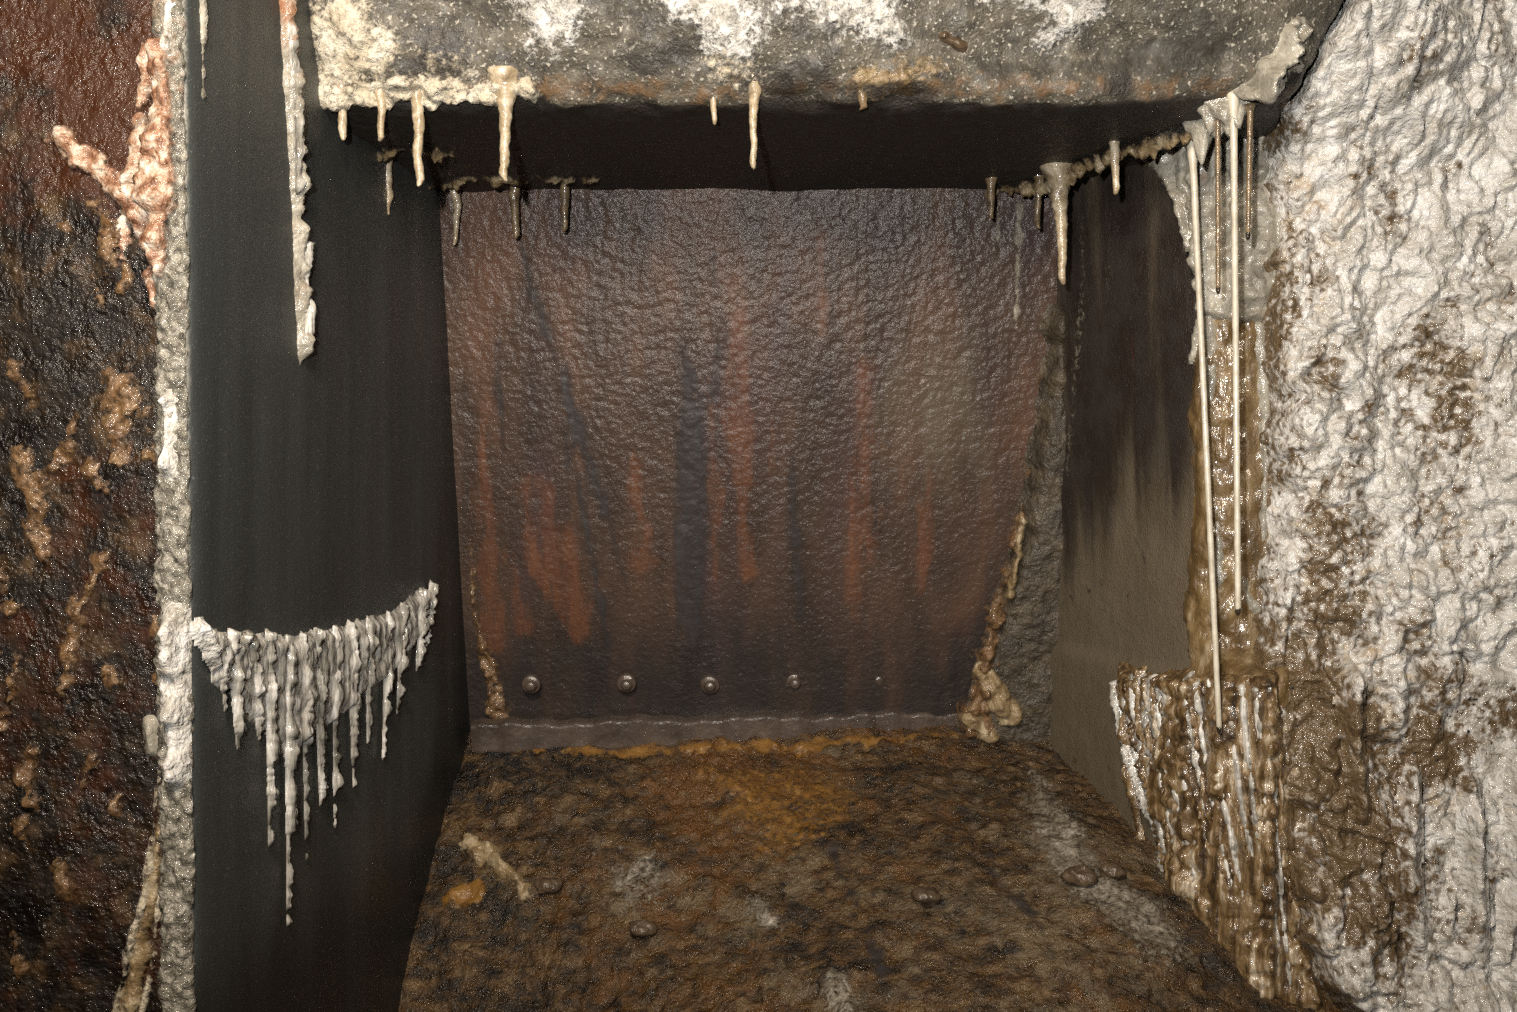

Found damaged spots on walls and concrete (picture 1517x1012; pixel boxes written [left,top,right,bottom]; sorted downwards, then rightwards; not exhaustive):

leakage [630,0,949,92]
efflorescence [44,0,439,1012]
efflorescence [466,545,509,719]
efflorescence [956,503,1027,745]
leakage [982,0,1517,1012]